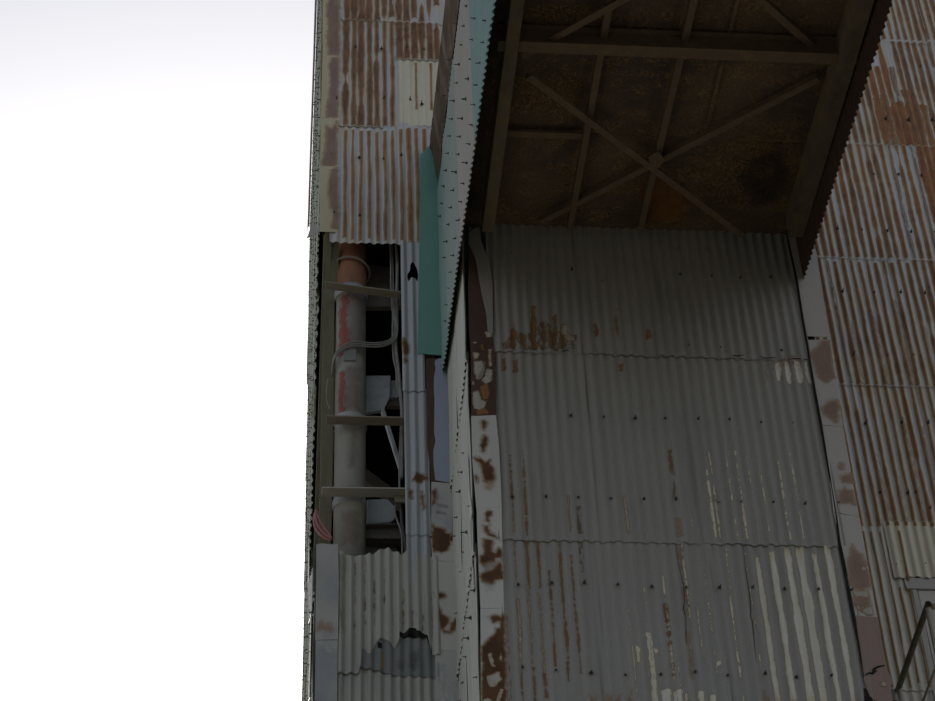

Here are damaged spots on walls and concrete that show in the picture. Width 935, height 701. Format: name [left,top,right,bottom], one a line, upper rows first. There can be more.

rust [322,0,440,286]
peeling [471,341,495,481]
rust [502,306,577,372]
peeling [775,341,836,384]
rust [814,0,935,688]
rust [431,525,451,552]
peeling [706,452,745,701]
peeling [744,452,856,701]
peeling [632,632,716,701]